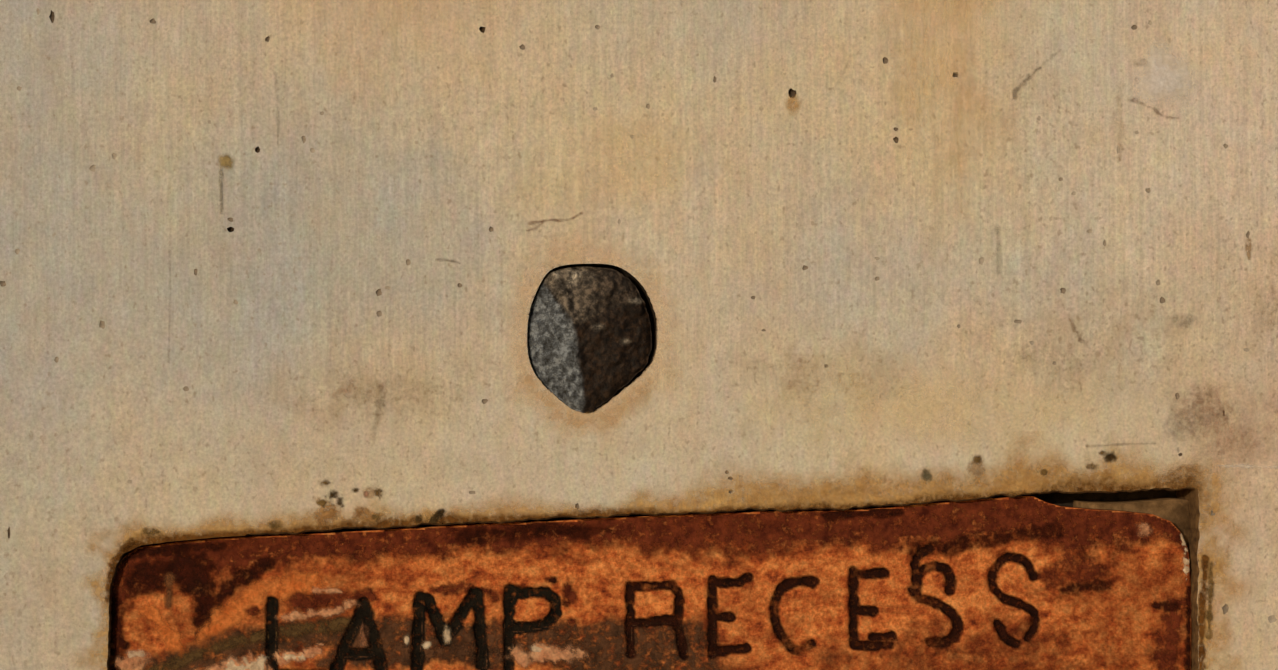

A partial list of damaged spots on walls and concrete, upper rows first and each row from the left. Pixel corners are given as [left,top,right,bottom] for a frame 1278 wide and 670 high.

rust [91,451,1227,670]